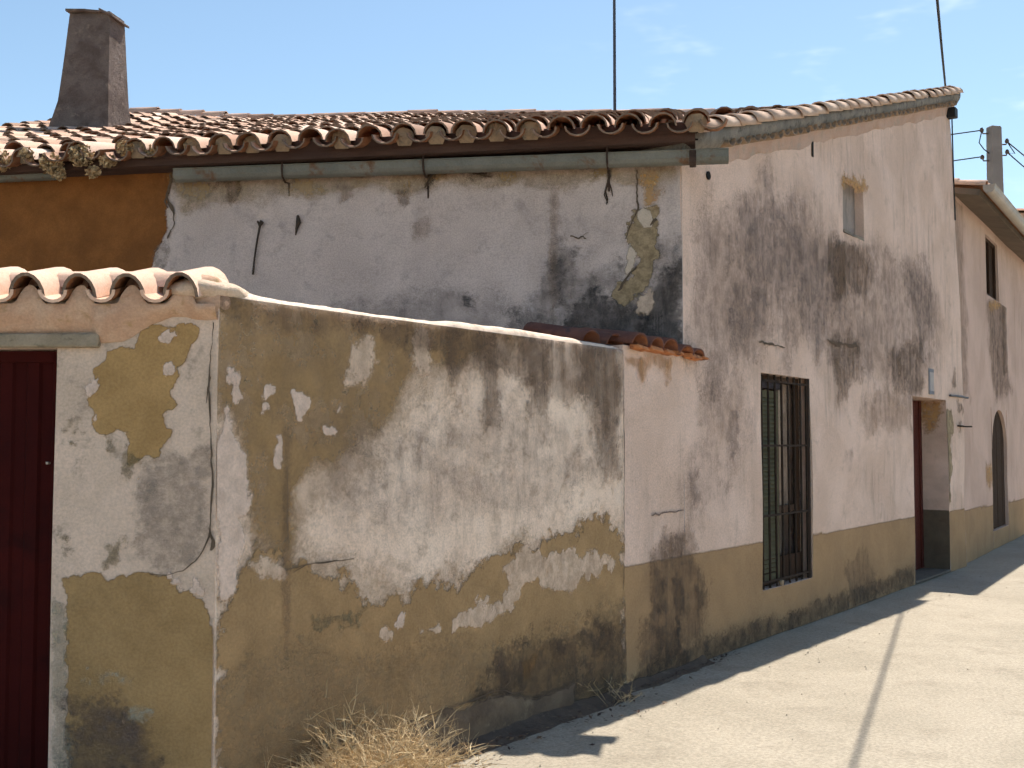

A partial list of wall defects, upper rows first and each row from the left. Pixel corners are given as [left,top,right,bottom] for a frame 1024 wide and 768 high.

flaking render [85,323,199,474]
crack [149,322,215,575]
leakage [217,296,621,556]
leakage [564,263,683,343]
flaking render [611,173,660,314]
leakage [832,334,862,403]
flaking render [62,406,626,768]
leakage [361,534,914,765]